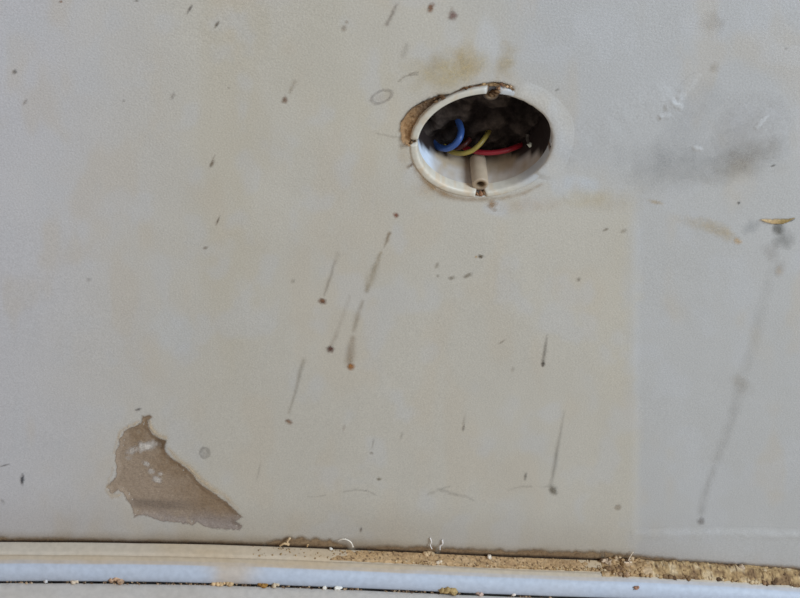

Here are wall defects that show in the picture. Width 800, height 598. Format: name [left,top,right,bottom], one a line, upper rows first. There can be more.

peeling [107,415,242,530]